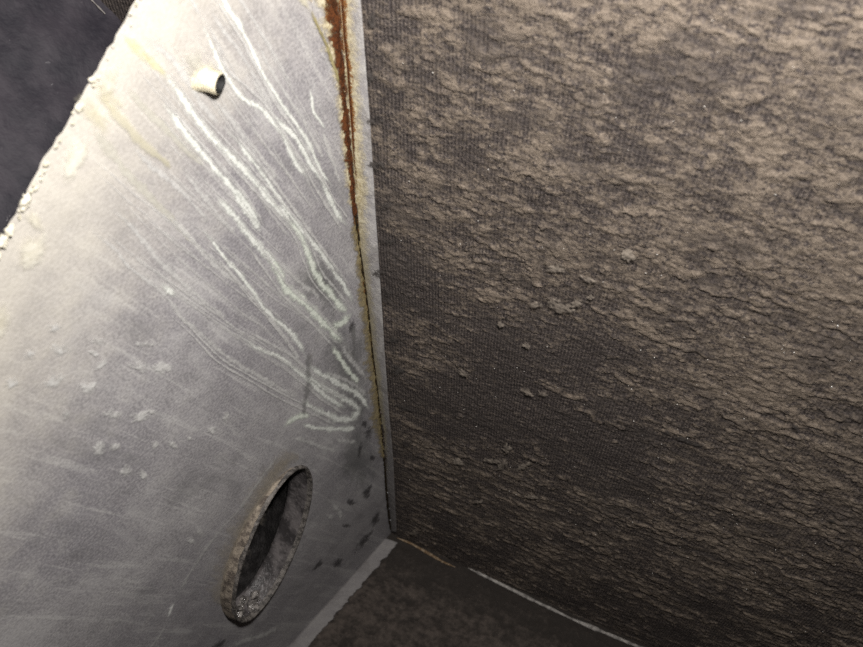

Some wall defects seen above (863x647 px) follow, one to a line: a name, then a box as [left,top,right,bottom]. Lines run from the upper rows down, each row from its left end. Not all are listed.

leakage [0,160,50,258]
leakage [97,0,371,453]
rust [313,0,385,429]